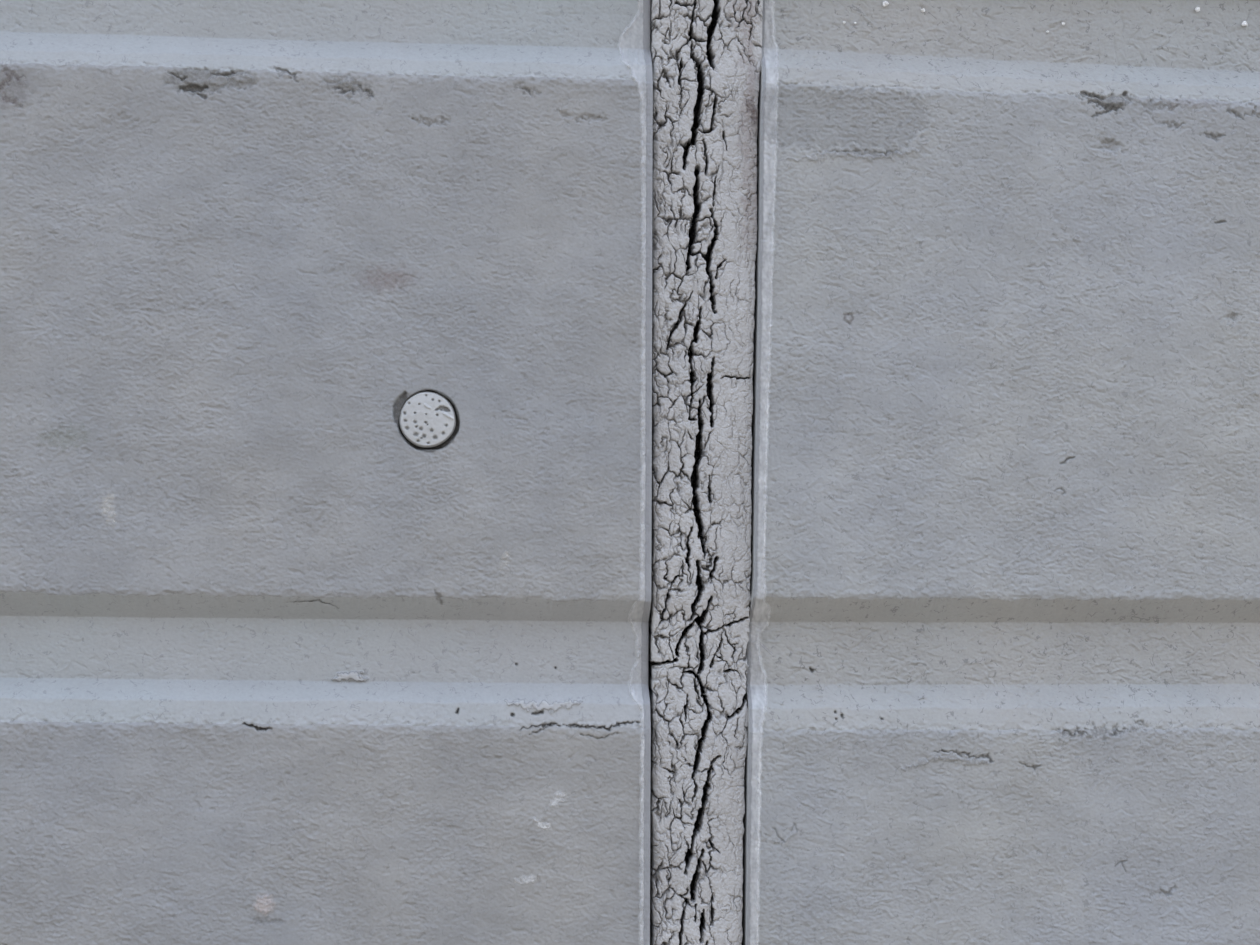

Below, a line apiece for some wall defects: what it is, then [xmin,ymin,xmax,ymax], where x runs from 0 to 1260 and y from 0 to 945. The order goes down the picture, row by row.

crack [648,0,759,945]